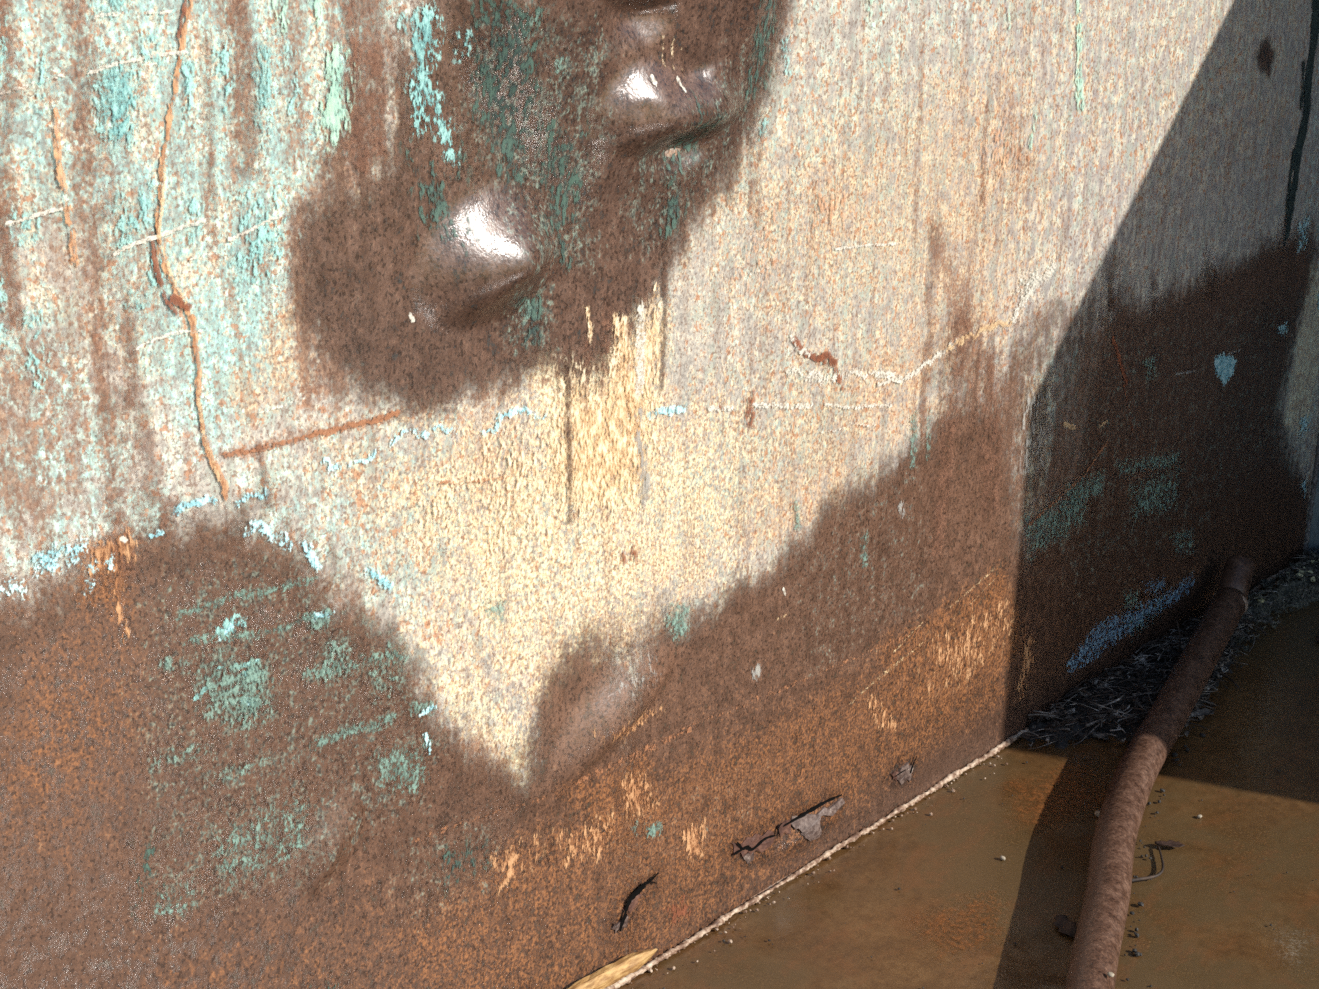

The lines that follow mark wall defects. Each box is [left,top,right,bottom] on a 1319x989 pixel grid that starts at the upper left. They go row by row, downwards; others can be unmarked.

water stain [293,0,793,485]
water stain [0,510,641,989]
crack [606,871,659,945]
rust [867,694,896,733]
water stain [625,0,1319,965]
rust [921,600,1036,700]